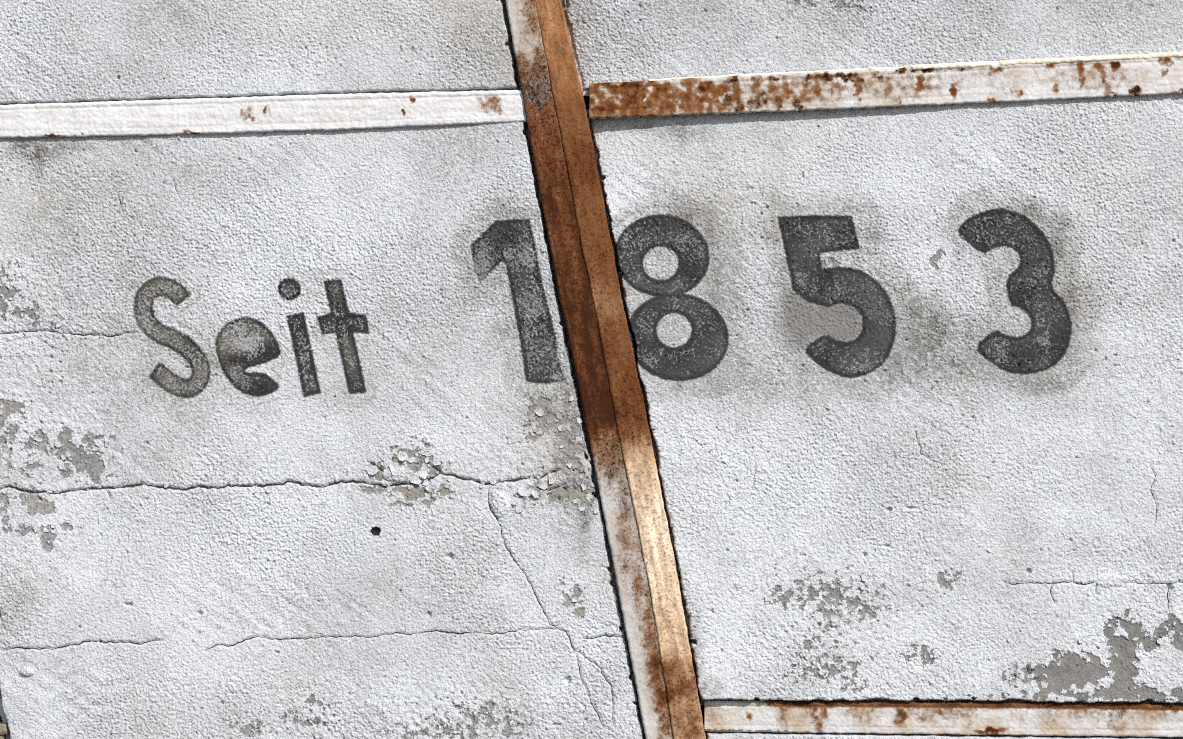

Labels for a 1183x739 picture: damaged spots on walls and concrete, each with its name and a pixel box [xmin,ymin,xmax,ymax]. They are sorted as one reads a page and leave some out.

corrosion [1077,61,1142,97]
corrosion [1158,56,1183,76]
corrosion [482,97,502,111]
corrosion [516,0,938,739]
peeling [0,399,116,553]
peeling [348,439,453,512]
crack [1,459,621,727]
peeling [924,568,965,595]
peeling [888,644,940,666]
peeling [988,609,1183,703]
corrosion [765,701,1183,730]
corrosion [975,726,1006,735]